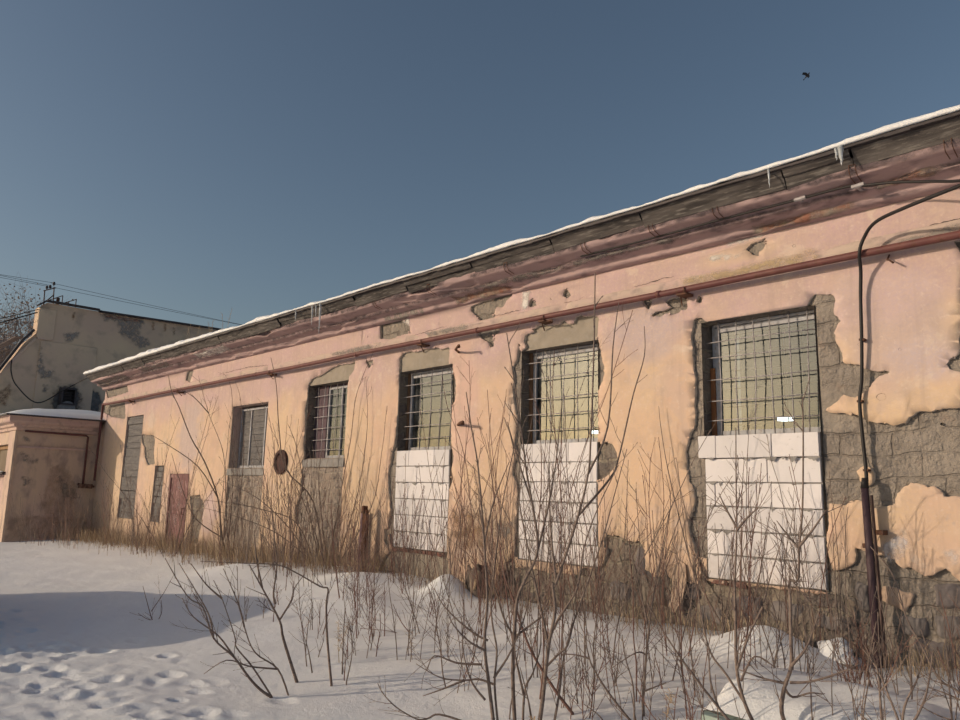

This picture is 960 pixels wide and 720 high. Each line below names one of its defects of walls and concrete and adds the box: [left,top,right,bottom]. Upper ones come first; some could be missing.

spalling [729,235,765,256]
spalling [901,225,960,249]
spalling [104,314,149,348]
spalling [382,319,410,339]
spalling [473,292,536,347]
spalling [498,294,960,669]